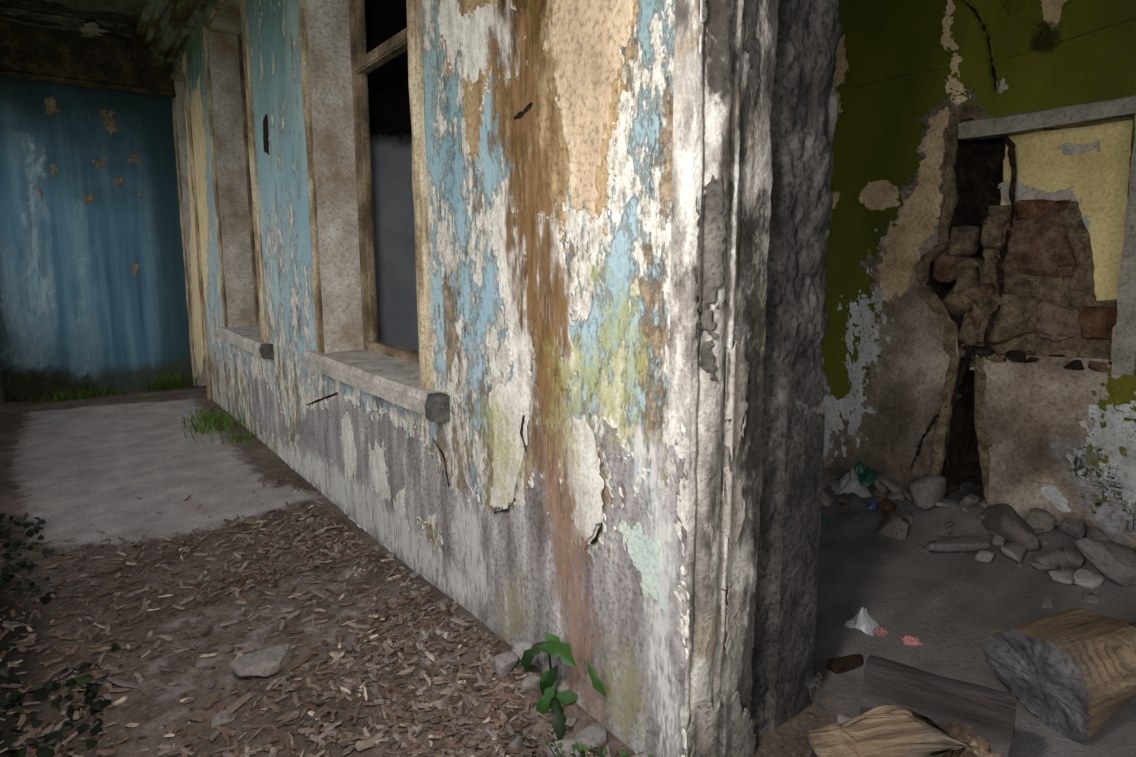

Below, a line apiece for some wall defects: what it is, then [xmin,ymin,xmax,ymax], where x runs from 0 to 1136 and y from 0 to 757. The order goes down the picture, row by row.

water stain [699,0,737,104]
flaking render [743,0,761,106]
peeling [833,34,852,118]
peeling [1032,0,1072,32]
peeling [290,0,756,757]
water stain [737,183,771,568]
crack [910,345,973,470]
peeling [823,80,1136,548]
water stain [281,444,490,617]
water stain [605,424,680,757]